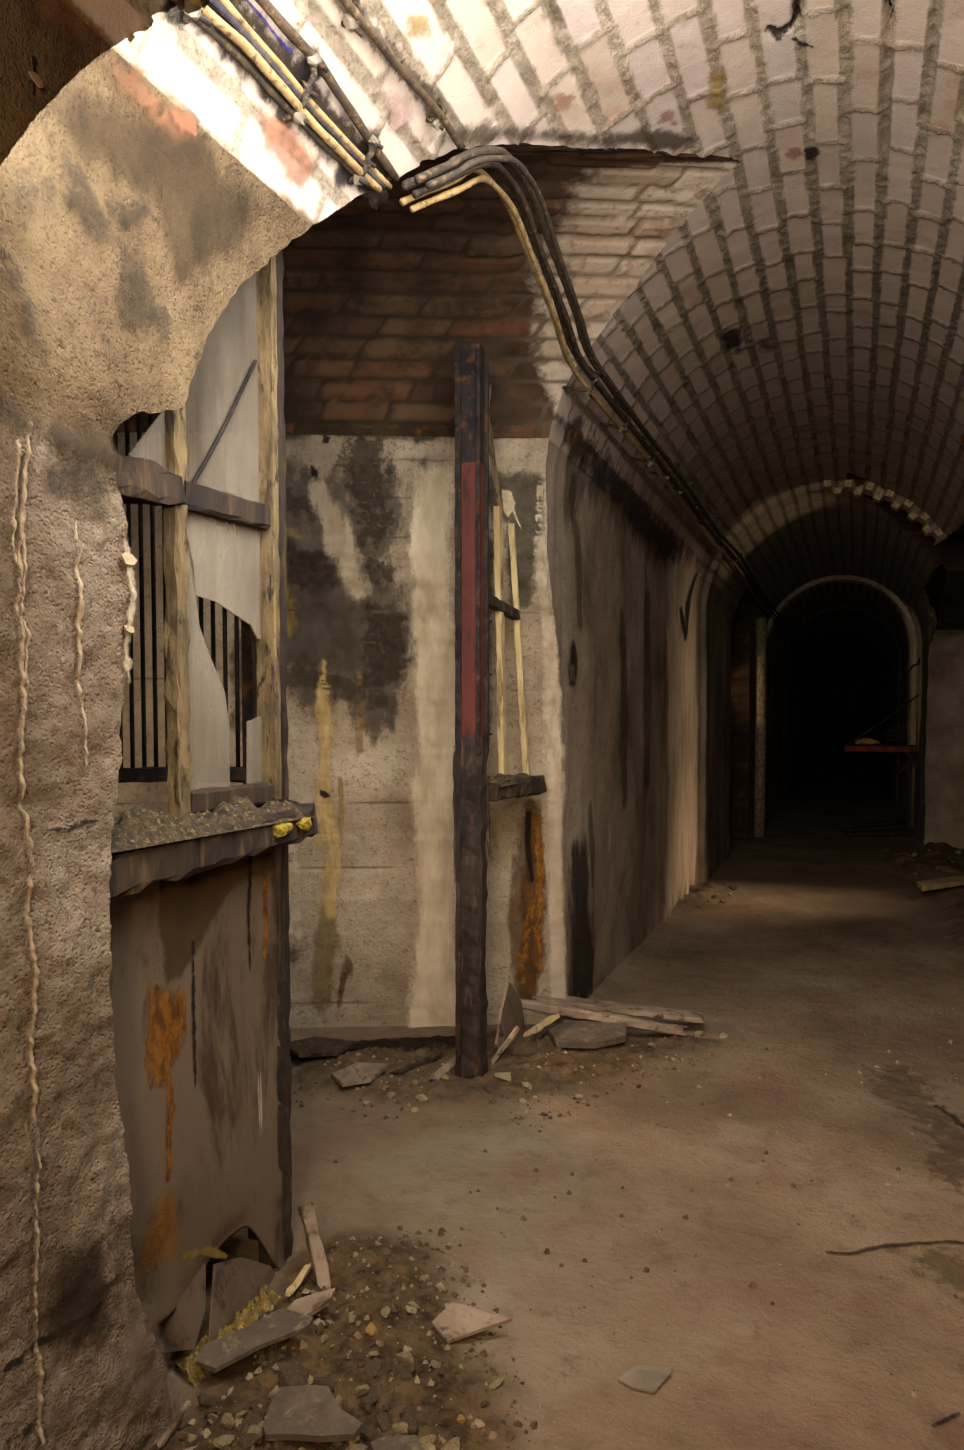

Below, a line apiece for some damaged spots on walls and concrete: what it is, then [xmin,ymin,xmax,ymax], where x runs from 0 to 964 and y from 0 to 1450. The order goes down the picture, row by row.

crack [765,0,813,48]
water stain [159,419,456,1086]
corrosion [508,800,549,1000]
corrosion [138,899,228,1277]
crack [933,1105,964,1129]
crack [825,1240,964,1255]